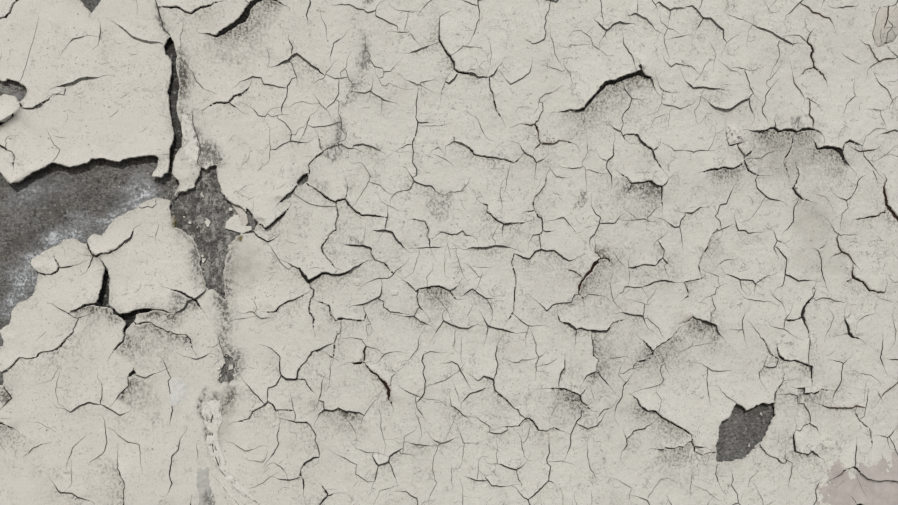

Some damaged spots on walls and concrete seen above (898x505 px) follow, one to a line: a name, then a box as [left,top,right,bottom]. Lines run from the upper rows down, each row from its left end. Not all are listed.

peeling [80,0,101,13]
crack [68,0,288,59]
peeling [0,79,27,102]
crack [0,19,127,161]
crack [38,199,159,275]
peeling [0,155,258,347]
crack [124,264,208,318]
crack [0,302,101,457]
peeling [216,354,235,383]
crack [45,322,238,505]
peeling [716,403,775,462]